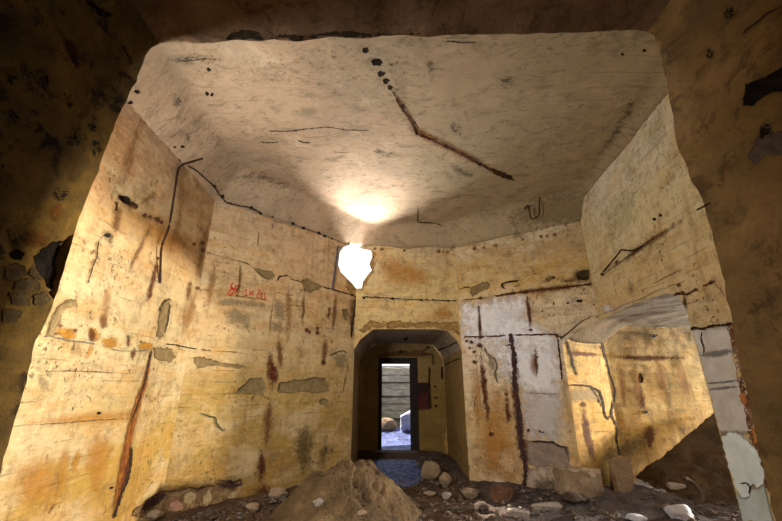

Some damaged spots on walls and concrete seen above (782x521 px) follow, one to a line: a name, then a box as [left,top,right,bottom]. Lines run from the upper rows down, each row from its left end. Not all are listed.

crack [362,47,513,180]
crack [187,165,351,246]
corrosion [600,222,680,276]
peeling [46,299,77,336]
peeling [156,298,172,337]
peeling [153,347,176,363]
peeling [193,356,246,369]
peeling [233,378,266,396]
corrosion [266,342,283,387]
peeling [278,377,329,405]
corrosion [465,306,494,436]
crack [600,344,621,455]